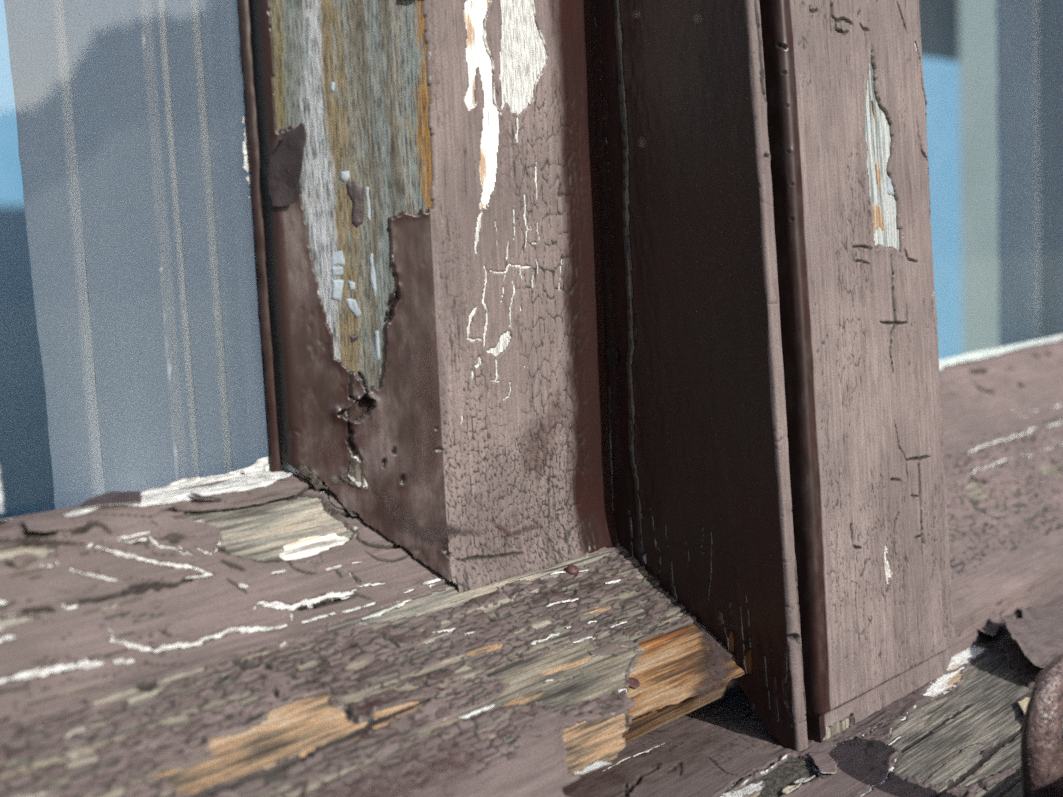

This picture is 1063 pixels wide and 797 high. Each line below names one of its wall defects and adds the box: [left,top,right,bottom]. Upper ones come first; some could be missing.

peeling [266,0,432,420]
peeling [463,0,547,208]
crack [467,162,562,401]
peeling [863,60,899,253]
crack [0,527,411,684]
peeling [172,490,354,561]
peeling [150,693,425,795]
crack [432,627,476,635]
crack [459,704,494,718]
crack [531,598,627,645]
crack [550,569,621,584]
peeling [888,605,1063,797]